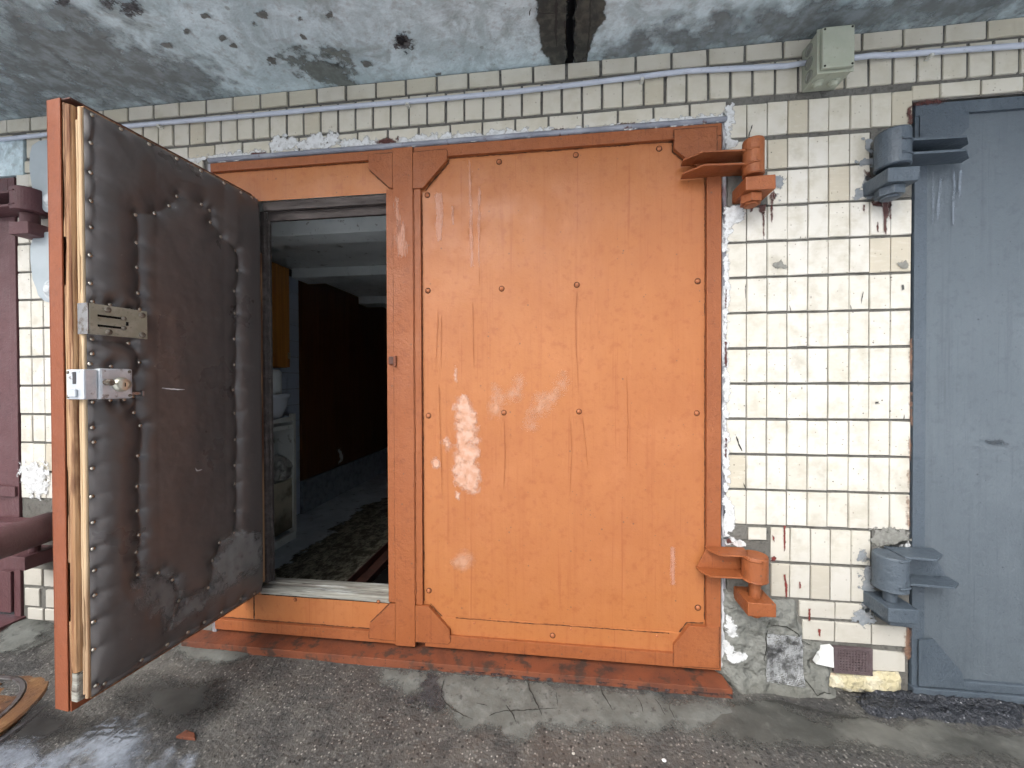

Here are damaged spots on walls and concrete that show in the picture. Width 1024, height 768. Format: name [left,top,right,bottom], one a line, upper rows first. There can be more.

damp [0,0,217,118]
damp [267,34,372,87]
peeling [722,615,748,664]
spalling [813,644,901,692]